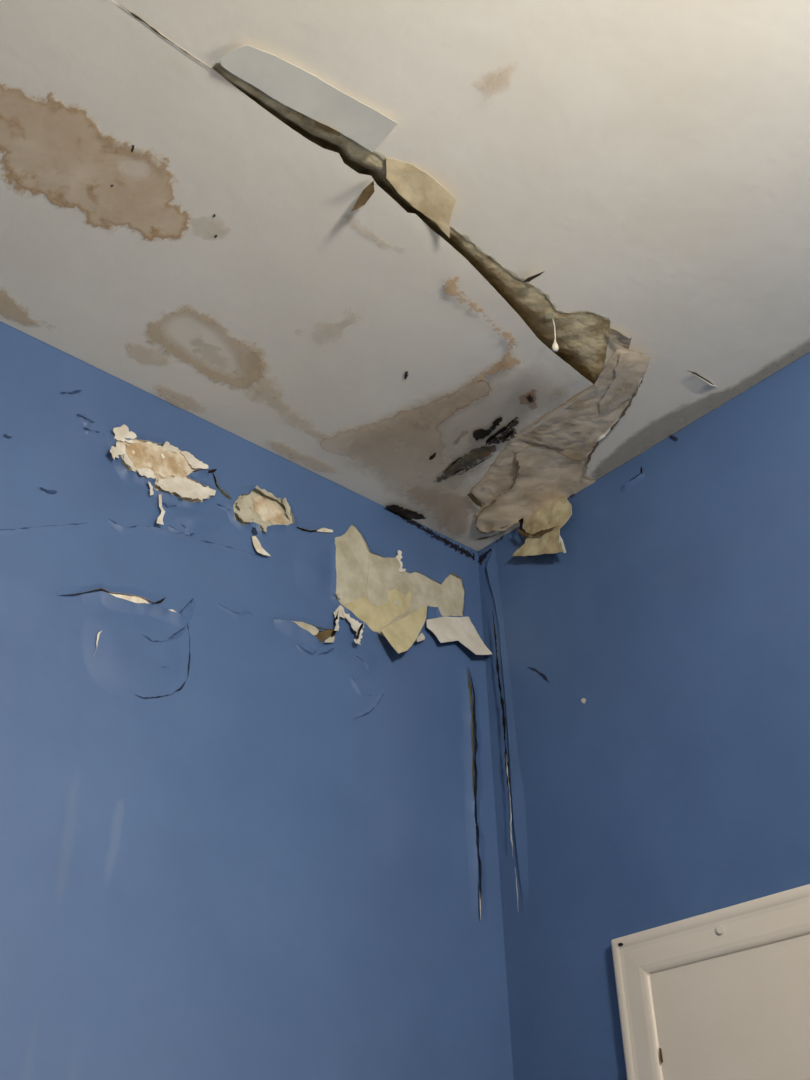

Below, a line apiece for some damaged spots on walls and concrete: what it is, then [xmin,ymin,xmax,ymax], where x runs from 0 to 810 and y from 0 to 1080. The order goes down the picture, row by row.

crack [119,4,211,69]
peeling [314,120,340,136]
damp [0,85,190,241]
peeling [351,180,374,212]
damp [0,291,33,322]
damp [372,328,520,431]
damp [522,390,537,409]
damp [437,417,519,482]
peeling [107,425,298,556]
damp [384,505,504,565]
peeling [330,328,651,913]
crack [460,667,487,923]